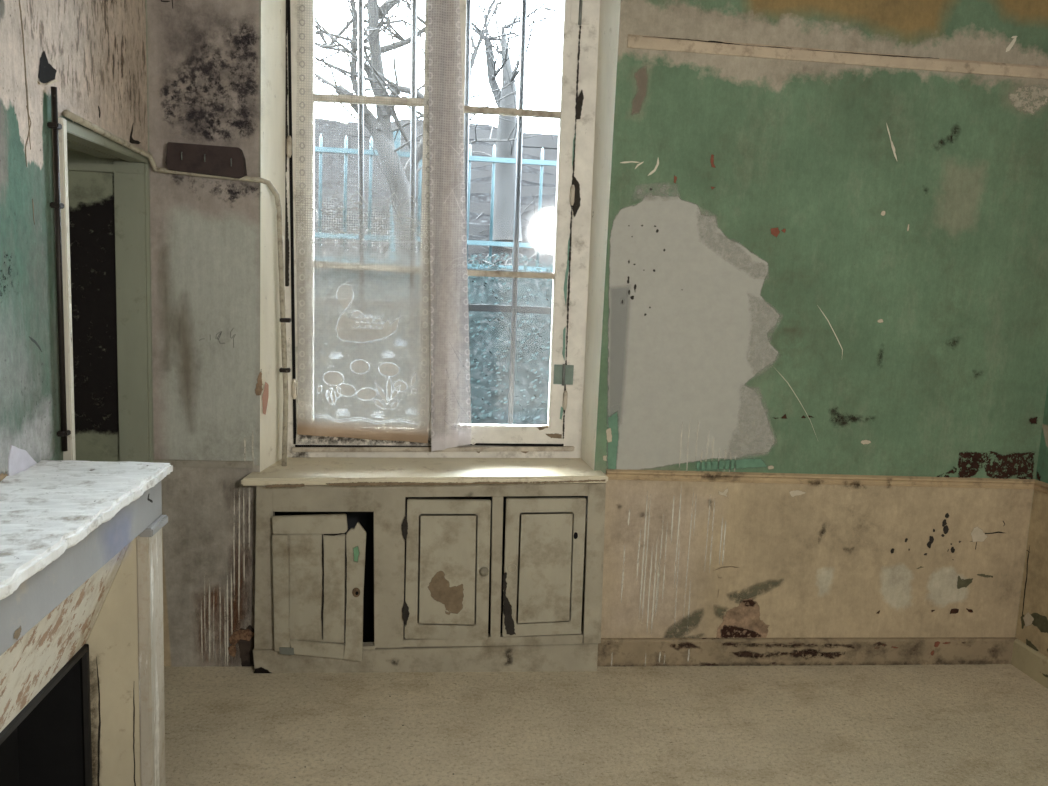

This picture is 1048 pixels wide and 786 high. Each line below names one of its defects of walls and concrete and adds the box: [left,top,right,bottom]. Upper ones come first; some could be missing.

crack [19,0,31,167]
spalling [38,51,60,85]
water stain [164,28,257,138]
peeling [937,451,1041,481]
peeling [917,513,988,569]
peeling [428,571,464,615]
peeling [957,574,993,589]
spalling [716,598,853,659]